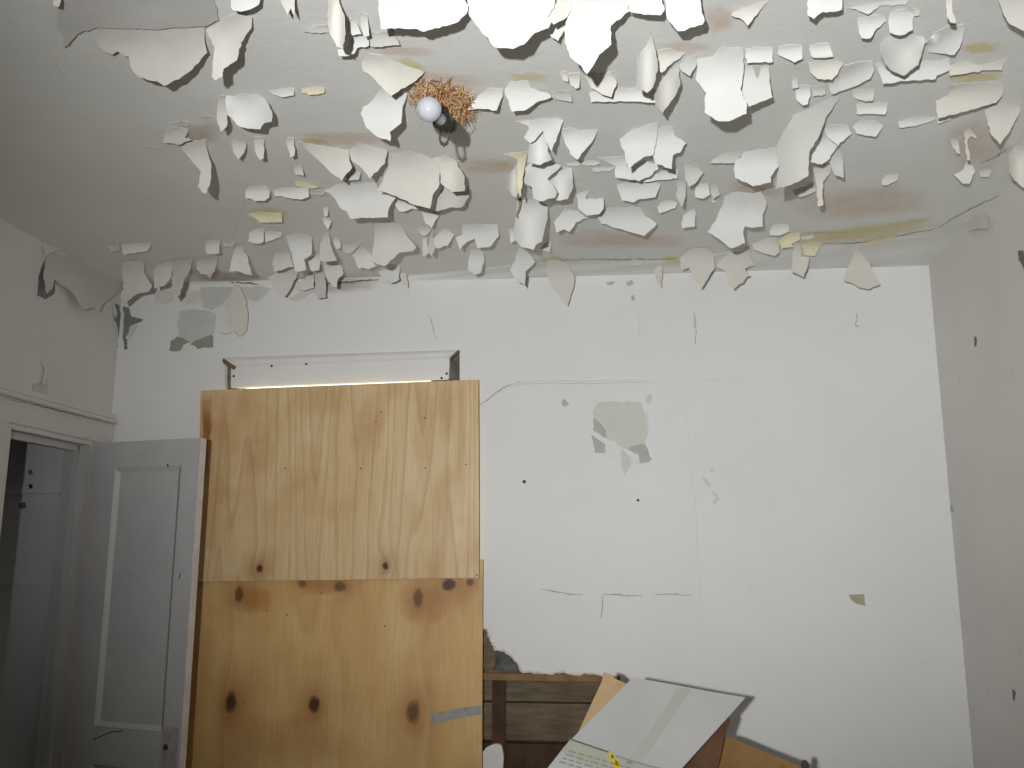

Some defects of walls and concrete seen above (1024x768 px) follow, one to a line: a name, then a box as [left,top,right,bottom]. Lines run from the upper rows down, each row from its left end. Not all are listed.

peeling [37,0,1024,352]
peeling [591,401,652,474]
crack [543,589,690,619]
flaking render [483,626,623,768]